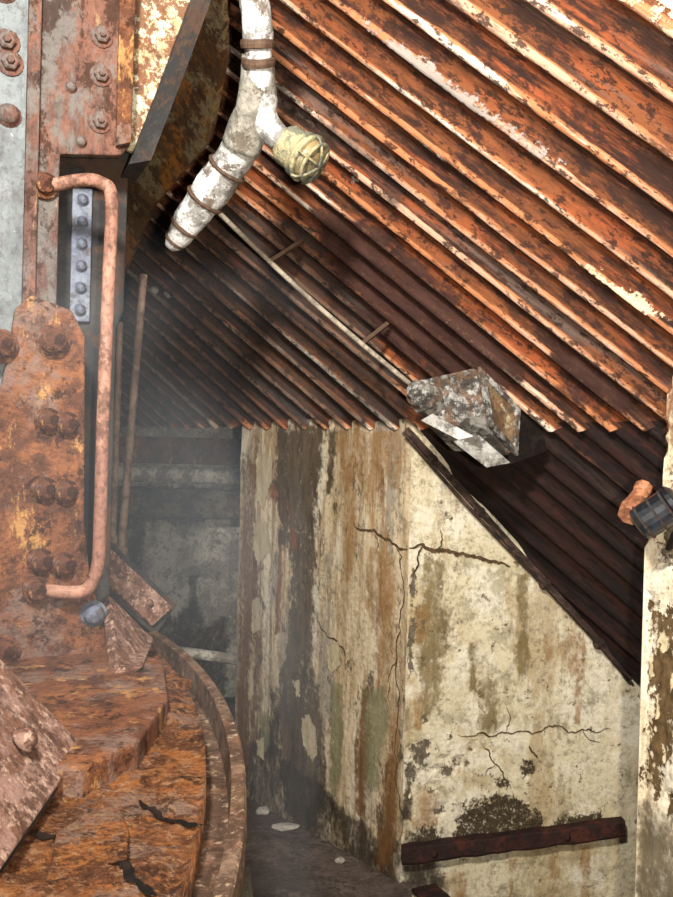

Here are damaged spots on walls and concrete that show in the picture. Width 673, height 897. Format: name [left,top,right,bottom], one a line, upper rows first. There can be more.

peeling [621,0,673,38]
rust [309,207,525,391]
rust [549,339,645,420]
spalling [654,527,673,566]
leakage [243,424,444,889]
crack [353,523,511,849]
leakage [520,759,535,779]
leakage [452,775,607,837]
crack [459,709,610,780]
spalling [636,596,673,817]
leakage [633,800,673,897]